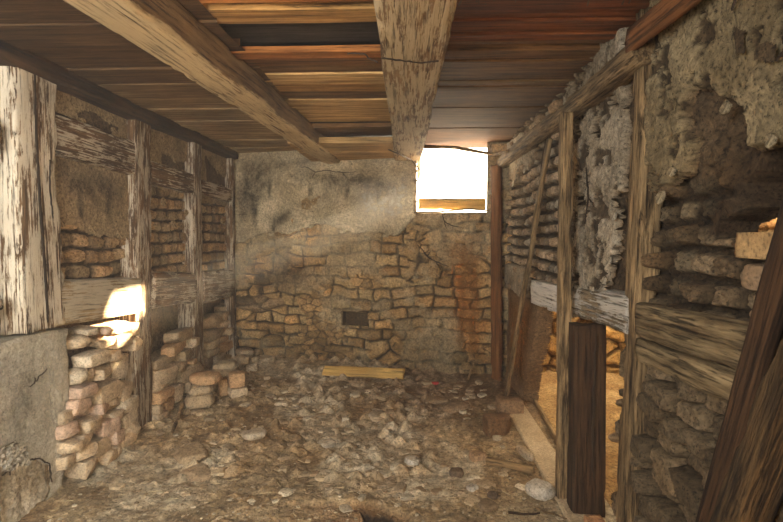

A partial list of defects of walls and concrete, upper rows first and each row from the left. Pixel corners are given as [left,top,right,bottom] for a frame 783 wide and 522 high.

crack [2,458,53,482]